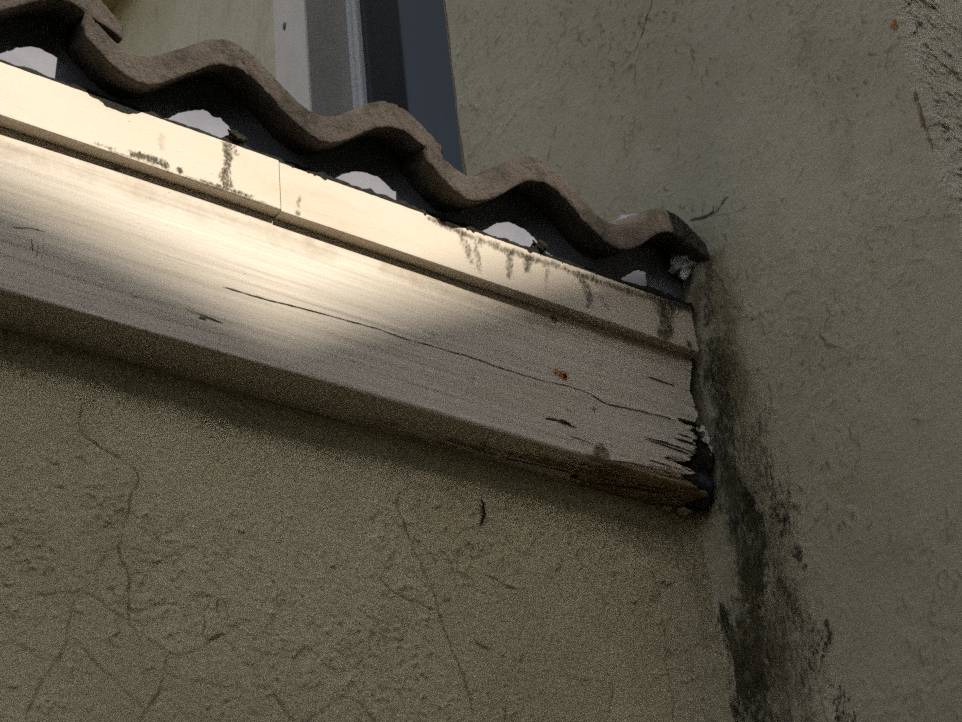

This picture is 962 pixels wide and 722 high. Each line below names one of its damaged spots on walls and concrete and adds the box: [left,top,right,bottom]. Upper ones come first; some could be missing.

damp [109,142,266,203]
crack [225,287,694,495]
crack [90,439,139,504]
damp [429,217,856,722]
peeling [696,425,713,456]